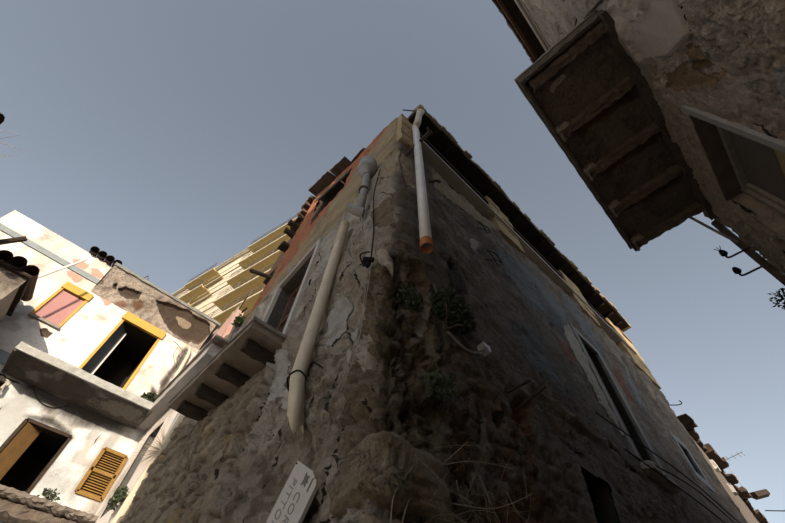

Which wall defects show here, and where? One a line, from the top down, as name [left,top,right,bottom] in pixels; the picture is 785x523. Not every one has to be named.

spalling [666,44,727,91]
crack [302,177,394,325]
spalling [113,283,142,299]
spalling [155,300,210,345]